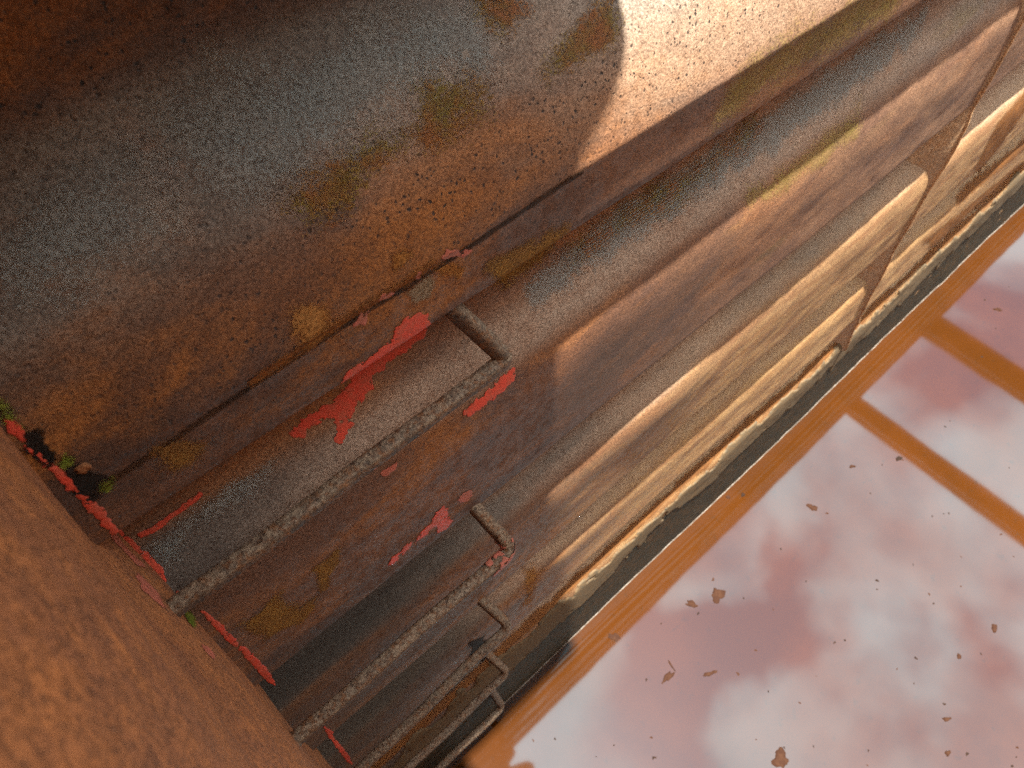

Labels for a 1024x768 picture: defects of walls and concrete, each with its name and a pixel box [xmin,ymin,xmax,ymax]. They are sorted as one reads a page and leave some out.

corrosion [855,93,1024,330]
corrosion [292,304,332,349]
peeling [289,310,431,444]
corrosion [73,462,92,474]
peeling [3,418,203,609]
corrosion [370,343,838,768]
peeling [389,171,1024,768]
peeling [200,610,276,685]
peeling [323,726,353,764]